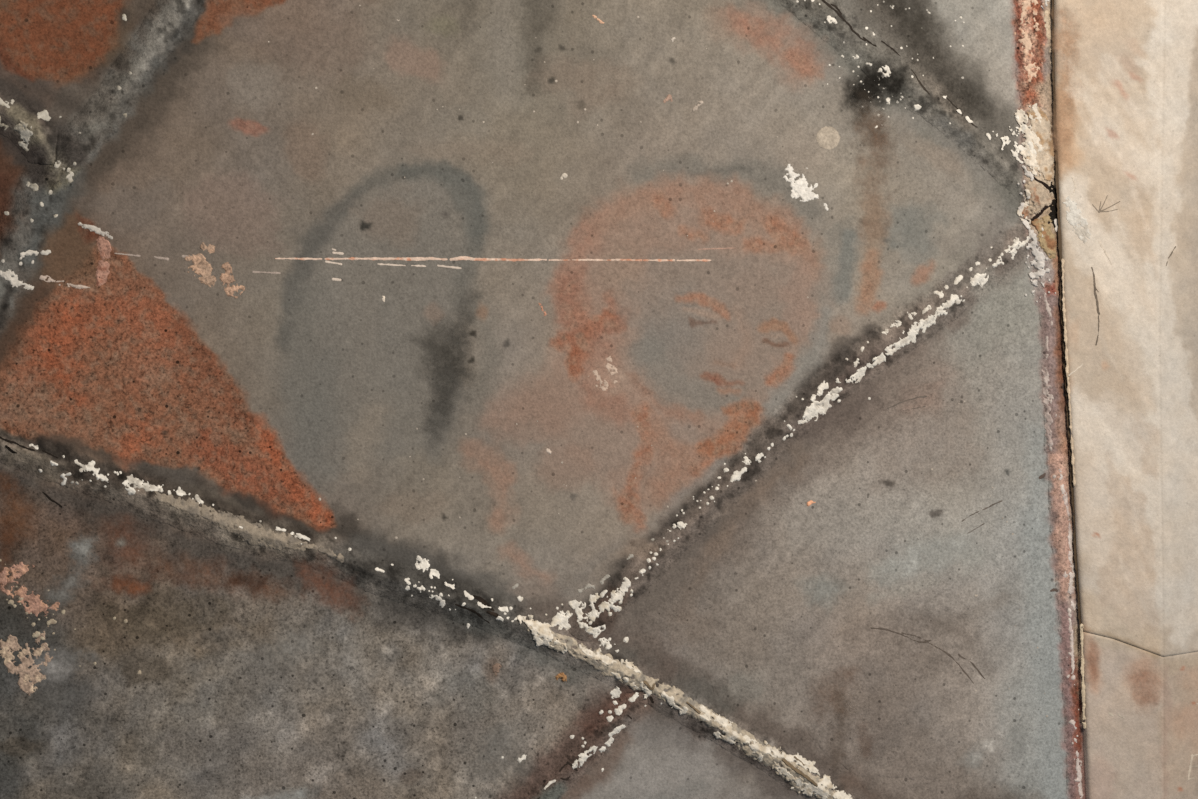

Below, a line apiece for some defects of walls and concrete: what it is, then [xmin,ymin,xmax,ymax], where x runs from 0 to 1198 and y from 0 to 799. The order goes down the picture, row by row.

water stain [846,68,904,140]
crack [822,0,978,128]
flaking render [184,242,245,299]
crack [1027,0,1082,626]
crack [1091,267,1100,345]
flaking render [0,559,65,696]